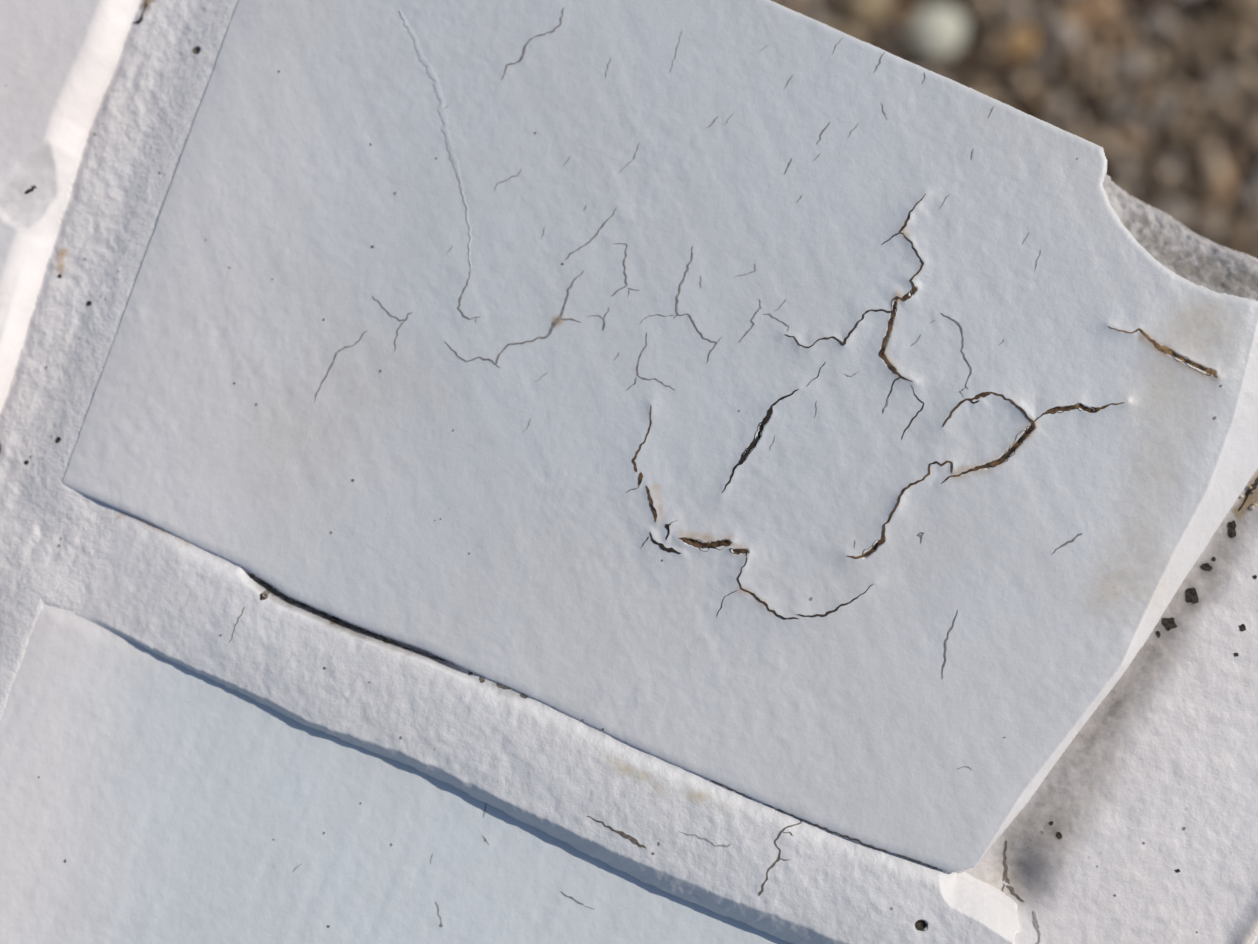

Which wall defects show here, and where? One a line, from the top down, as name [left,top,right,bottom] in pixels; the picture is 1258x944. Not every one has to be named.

crack [314,297,413,403]
crack [1108,326,1218,378]
crack [444,193,1126,620]
spalling [1227,520,1236,538]
spalling [1185,587,1199,604]
spalling [1162,617,1177,631]
crack [710,780,938,896]